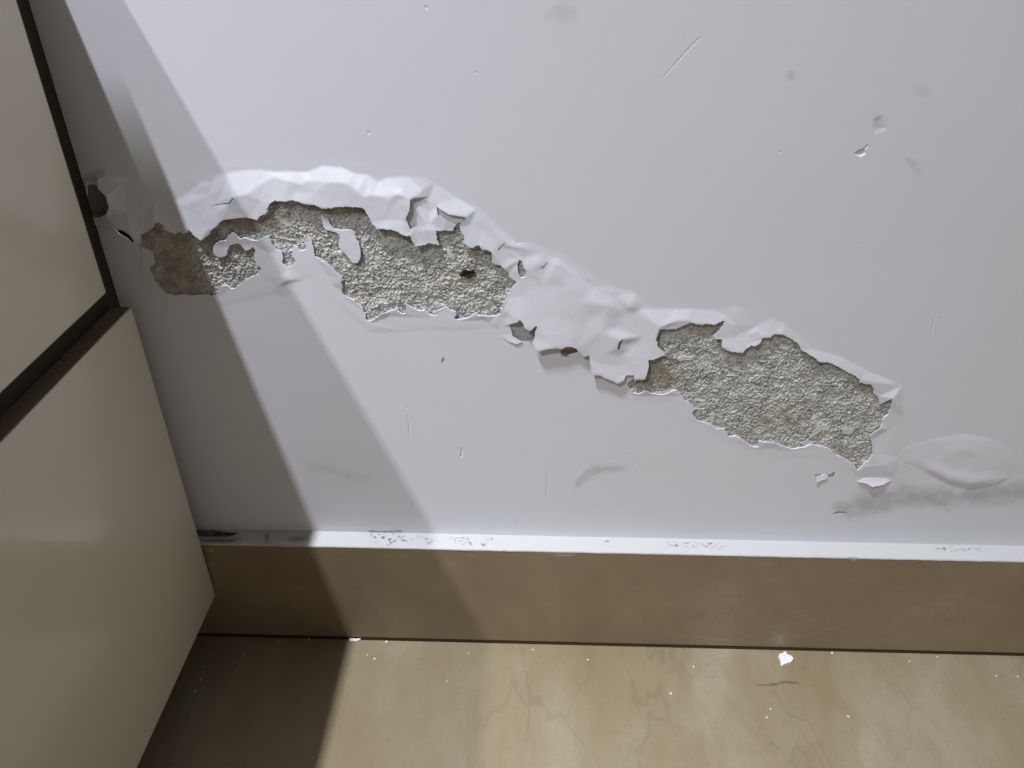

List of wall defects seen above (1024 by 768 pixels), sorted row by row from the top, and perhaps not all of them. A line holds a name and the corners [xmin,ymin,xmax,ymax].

peeling [82,157,526,333]
peeling [628,302,906,487]